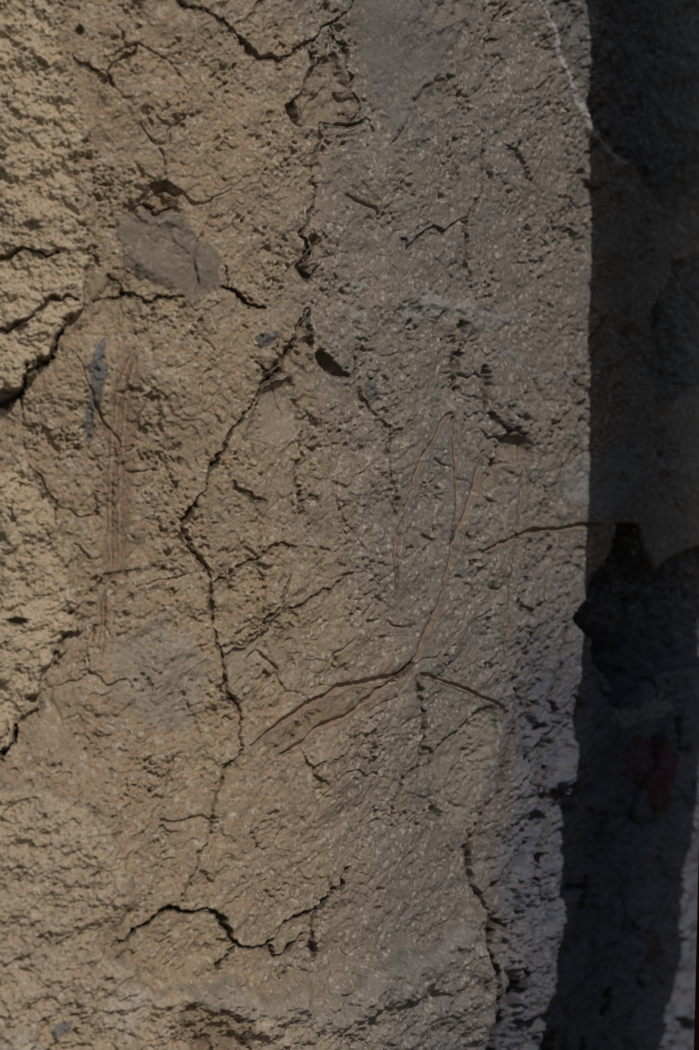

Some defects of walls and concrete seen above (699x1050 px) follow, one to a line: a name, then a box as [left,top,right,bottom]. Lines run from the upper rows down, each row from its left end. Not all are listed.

crack [71,47,137,86]
crack [176,0,375,281]
crack [0,246,60,261]
crack [0,273,184,333]
crack [220,269,267,309]
crack [0,329,64,409]
crack [352,348,417,515]
crack [111,308,350,969]
spalling [572,523,699,704]
crack [0,723,19,756]
crack [280,734,378,787]
crack [390,677,432,817]